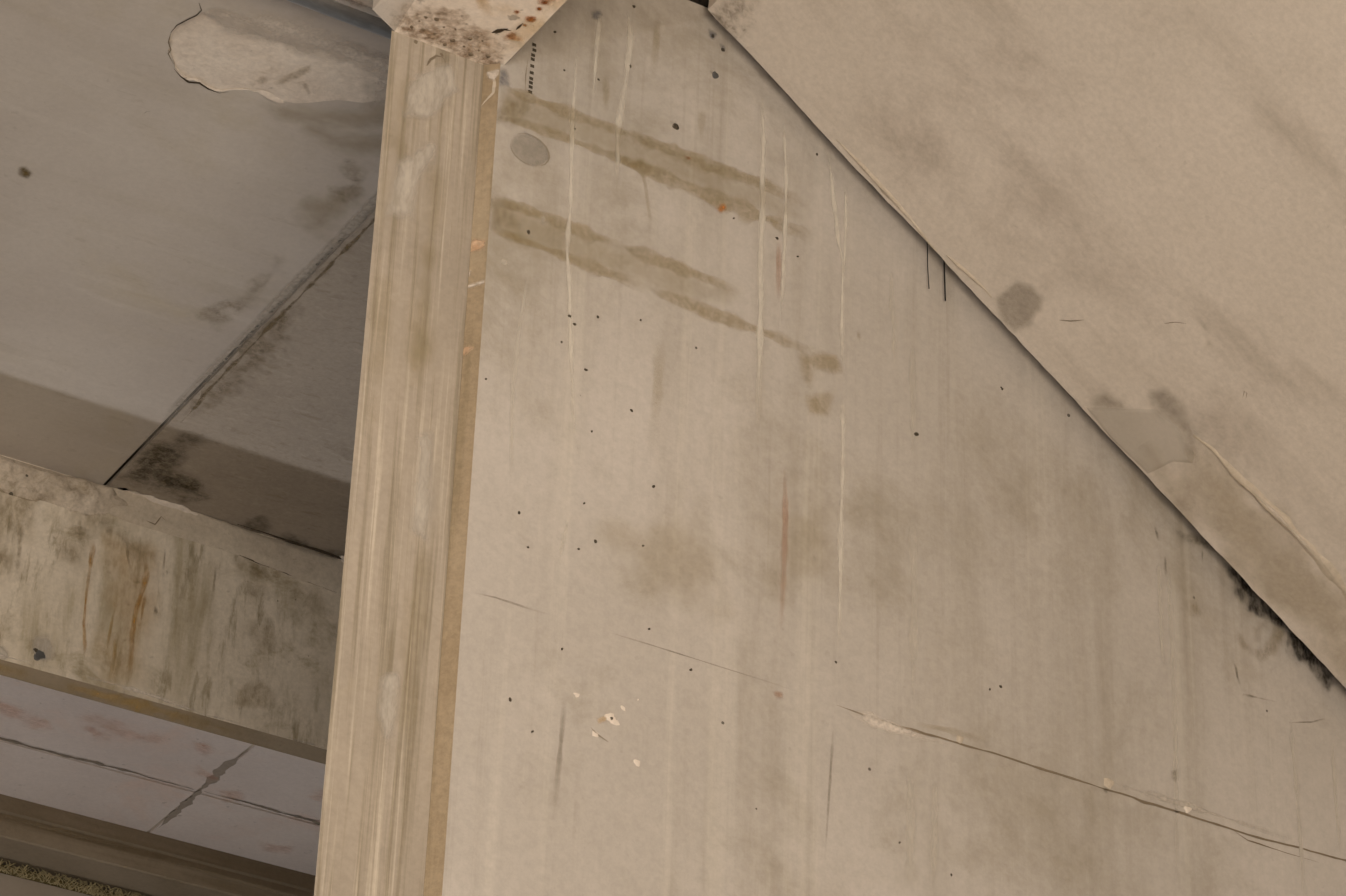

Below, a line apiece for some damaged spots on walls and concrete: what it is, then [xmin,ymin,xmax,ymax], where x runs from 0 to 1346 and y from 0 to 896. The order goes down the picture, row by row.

spalling [168,4,389,104]
spalling [410,16,491,58]
damp [566,73,576,364]
damp [757,117,766,377]
crack [0,737,320,825]
crack [840,706,1346,863]